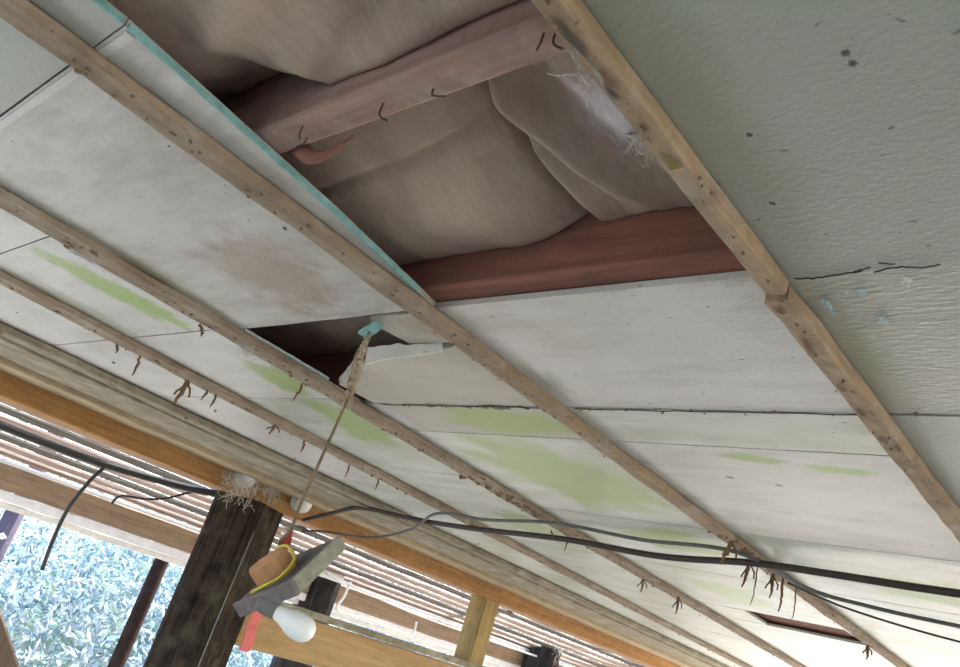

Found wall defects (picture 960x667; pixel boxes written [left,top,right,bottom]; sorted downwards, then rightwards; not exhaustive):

spalling [92,0,419,291]
crack [794,262,941,280]